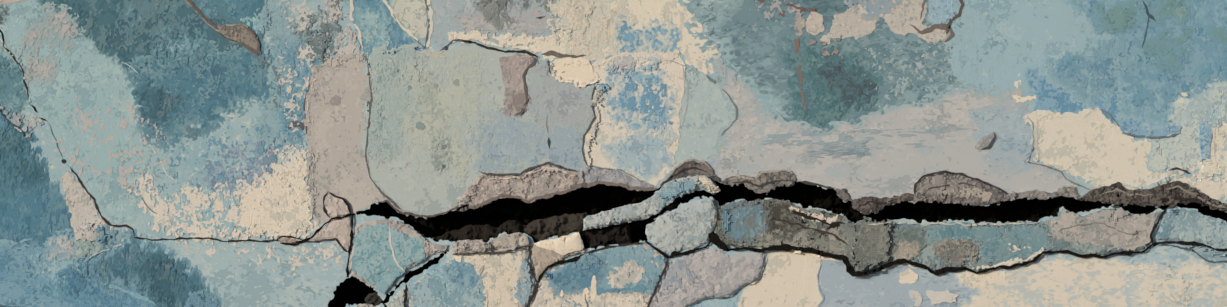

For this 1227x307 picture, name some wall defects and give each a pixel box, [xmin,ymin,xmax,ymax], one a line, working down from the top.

peeling [150,21,209,66]
peeling [808,4,877,46]
peeling [844,0,903,21]
peeling [865,43,927,83]
peeling [926,0,961,25]
crack [70,167,1227,307]